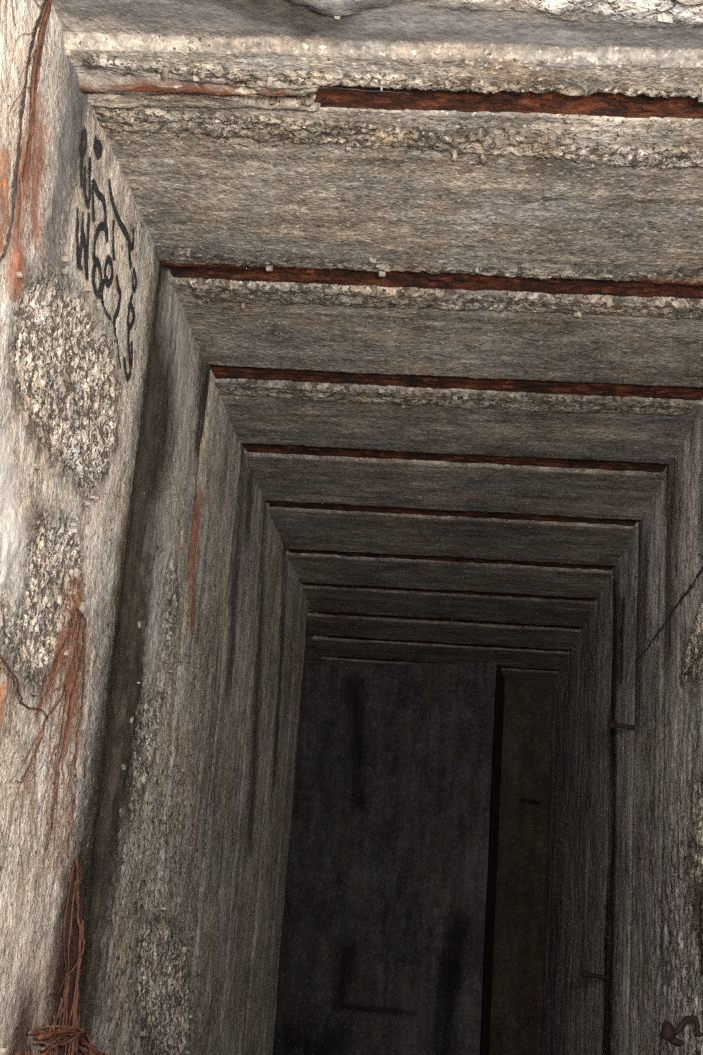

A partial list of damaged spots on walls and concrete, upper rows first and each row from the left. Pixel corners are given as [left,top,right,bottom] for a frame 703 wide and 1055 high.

crack [635,553,703,666]
crack [678,652,703,678]